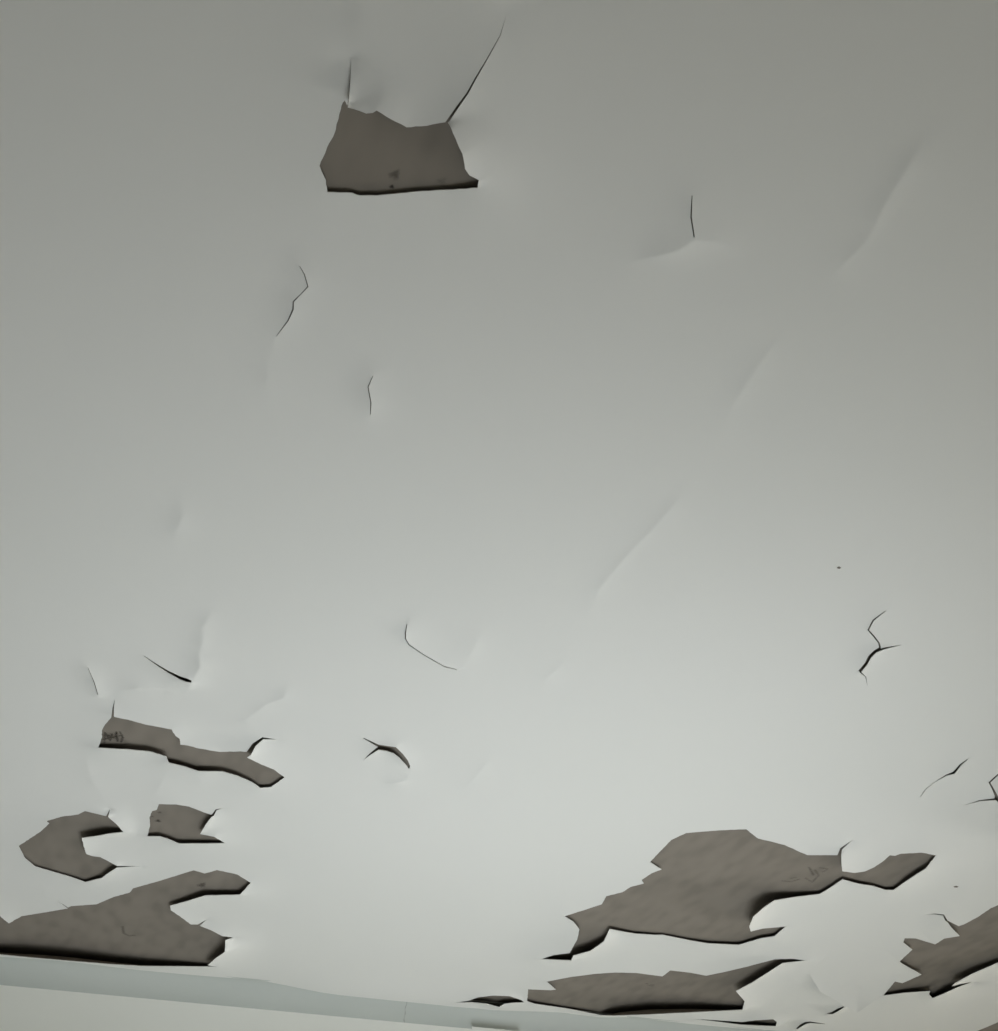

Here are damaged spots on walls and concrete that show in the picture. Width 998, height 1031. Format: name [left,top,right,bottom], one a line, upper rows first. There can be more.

peeling [312,0,546,218]
crack [843,608,907,690]
peeling [80,697,299,797]
crack [358,736,422,788]
crack [916,757,998,807]
peeling [0,798,279,975]
peeling [428,822,998,1031]